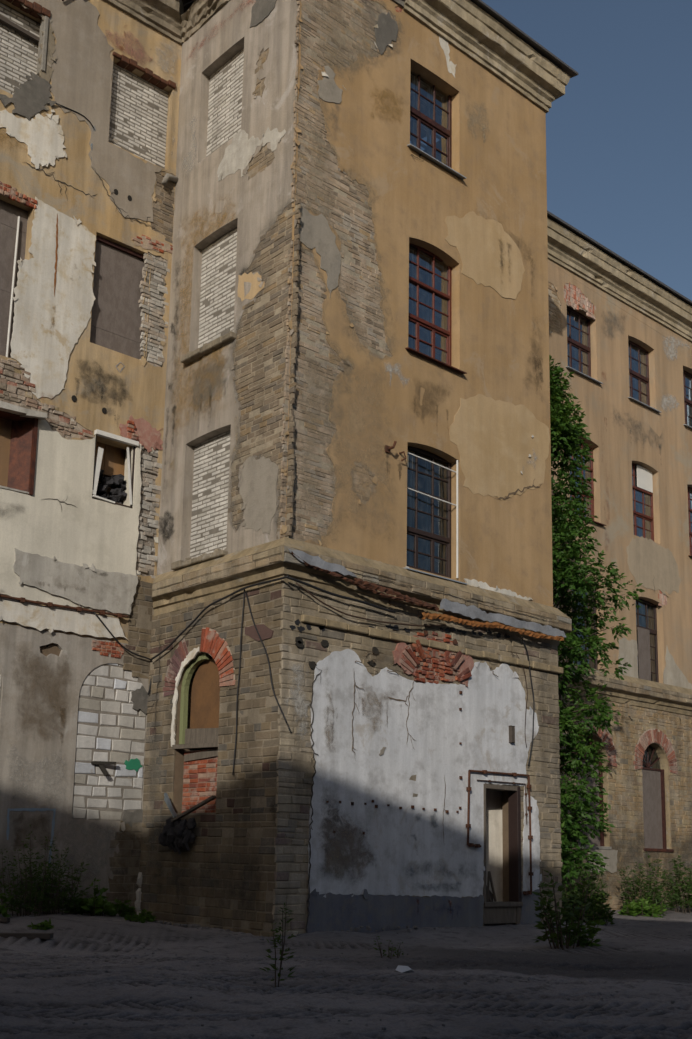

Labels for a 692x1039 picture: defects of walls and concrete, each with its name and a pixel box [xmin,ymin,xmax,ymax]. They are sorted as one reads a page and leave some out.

flaking render [0,17,67,169]
spalling [217,0,407,546]
flaking render [0,197,163,679]
crack [352,668,416,761]
flaking render [308,630,542,898]